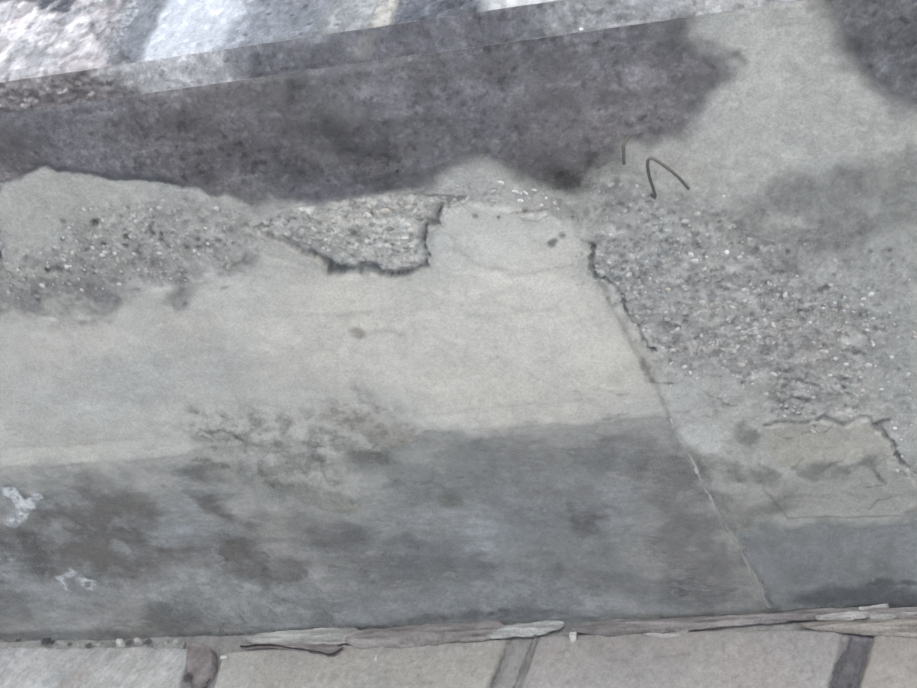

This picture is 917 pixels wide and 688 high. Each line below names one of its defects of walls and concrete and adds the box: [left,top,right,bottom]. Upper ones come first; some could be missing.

water stain [0,0,729,205]
water stain [823,0,917,104]
spalling [4,198,238,299]
spalling [258,181,563,275]
spalling [587,184,899,437]
crack [763,369,845,426]
crack [875,419,904,464]
water stain [0,414,917,643]